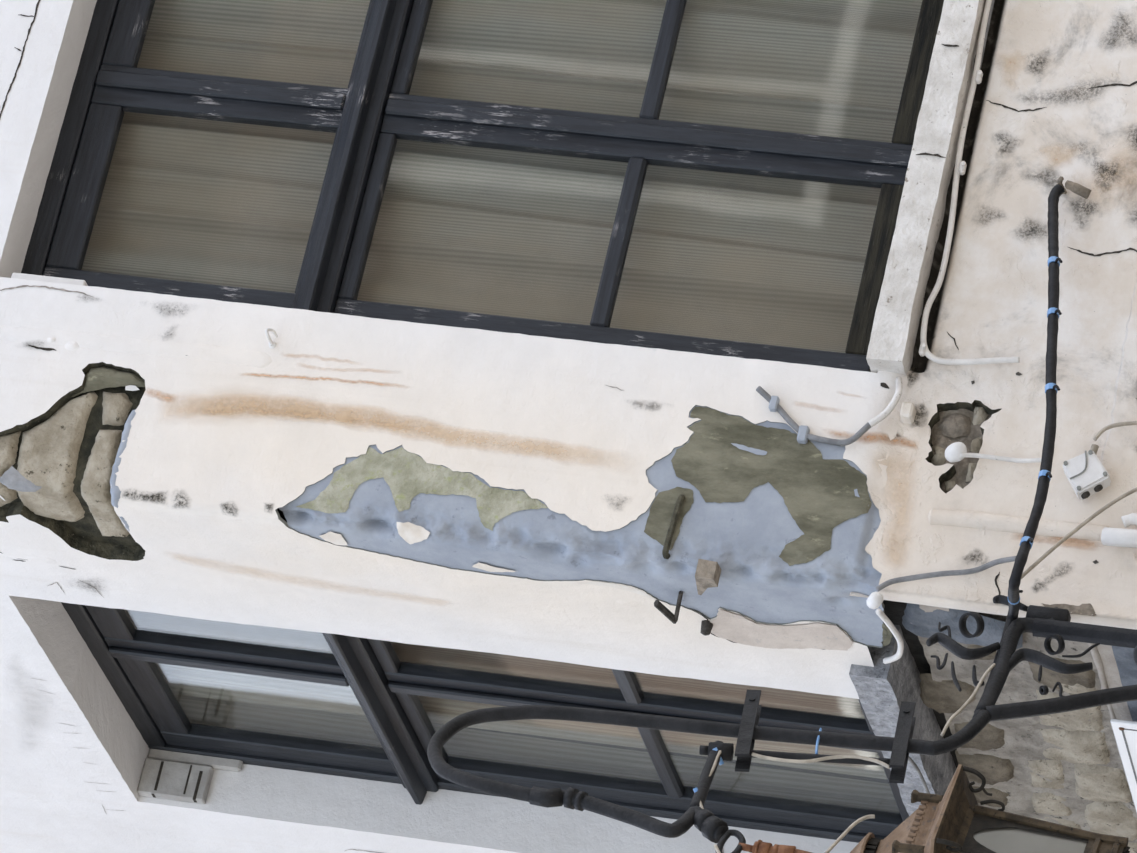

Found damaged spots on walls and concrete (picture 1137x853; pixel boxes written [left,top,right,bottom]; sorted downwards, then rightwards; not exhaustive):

crack [0,0,40,118]
crack [986,100,1046,112]
crack [1089,81,1137,89]
water stain [1098,165,1119,189]
spalling [0,362,146,561]
spalling [926,400,1001,493]
peeling [275,405,892,651]